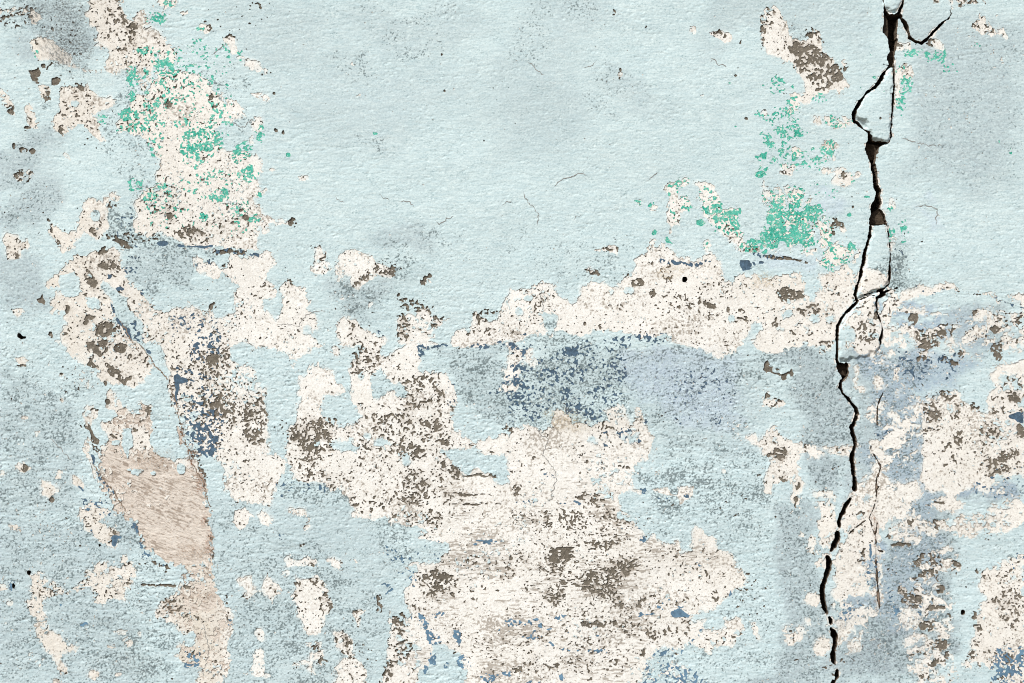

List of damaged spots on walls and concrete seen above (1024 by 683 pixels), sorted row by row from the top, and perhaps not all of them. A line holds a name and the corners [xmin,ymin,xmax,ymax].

crack [918,22,944,45]
crack [851,13,899,115]
peeling [13,169,34,183]
crack [865,138,940,226]
peeling [2,227,30,260]
peeling [594,235,627,256]
peeling [0,389,46,476]
peeling [668,277,1024,683]
crack [819,362,883,661]
peeling [326,553,358,572]
peeling [0,573,20,606]